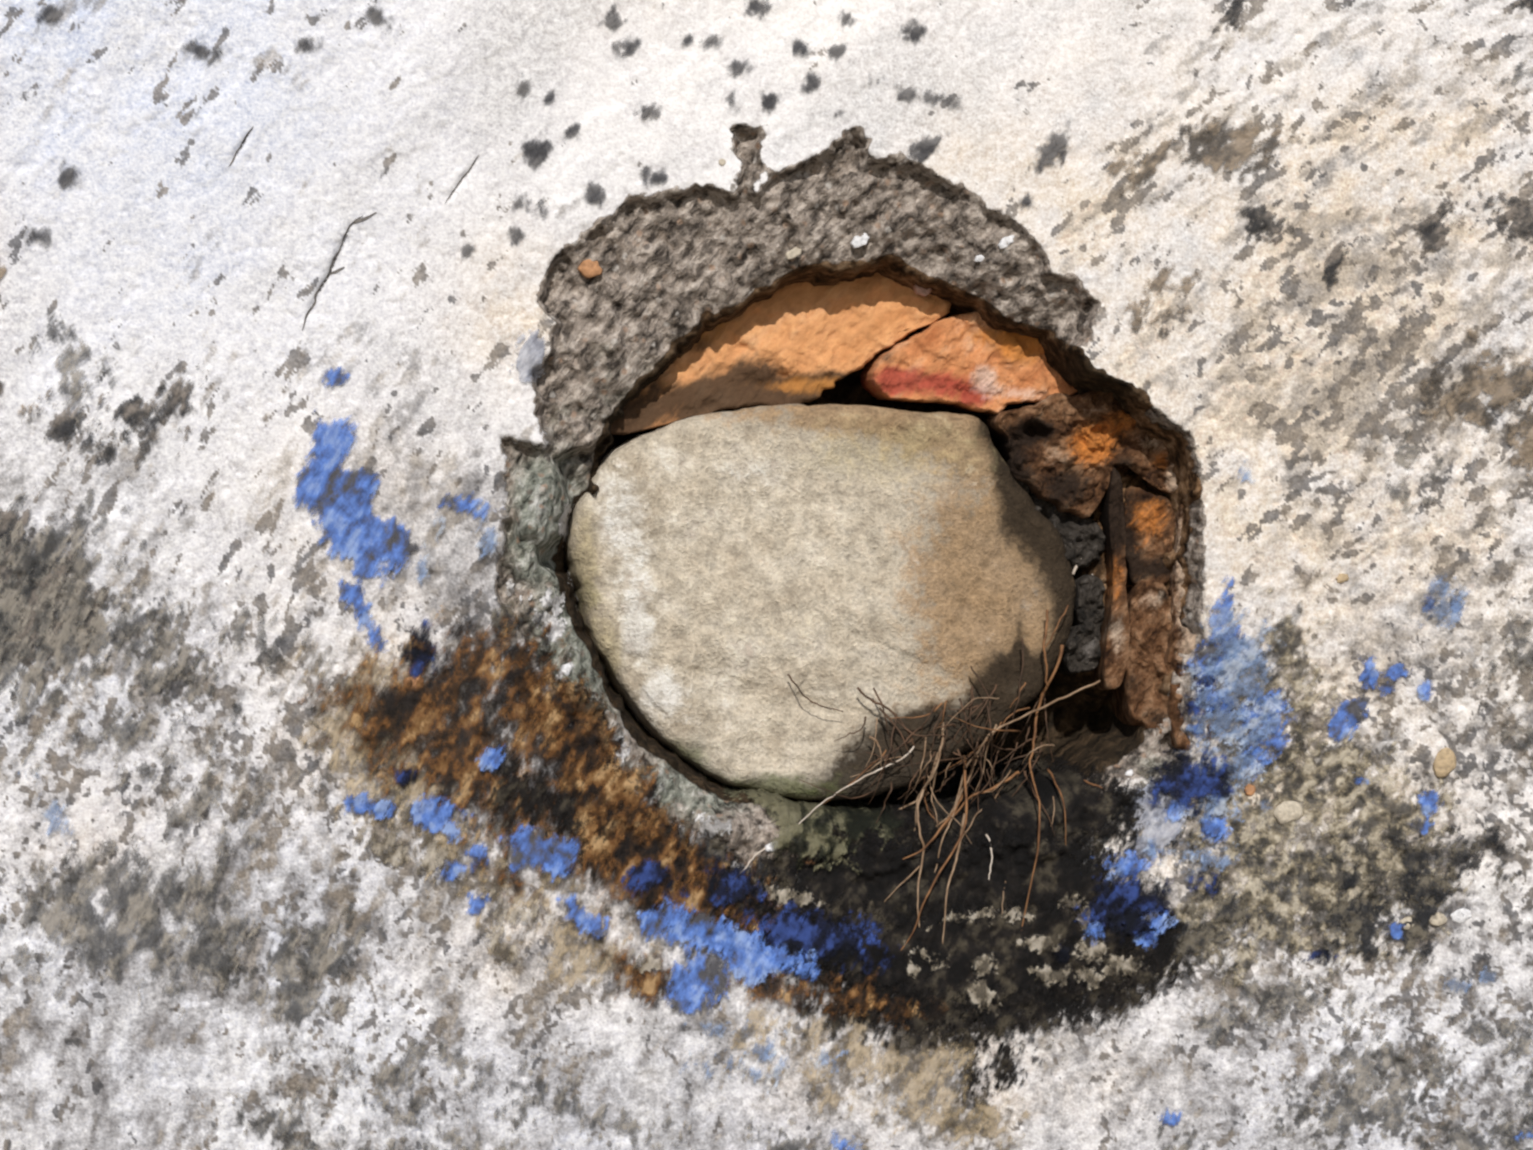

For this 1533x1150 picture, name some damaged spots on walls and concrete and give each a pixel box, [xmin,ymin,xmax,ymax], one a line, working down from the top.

peeling [322,367,350,386]
peeling [295,410,436,678]
spalling [434,123,1297,1036]
leakage [0,488,626,1063]
leakage [223,1025,692,1150]
peeling [344,768,611,966]
corrosion [299,615,782,1007]
corrosion [727,972,945,1023]
leakage [541,673,1533,1150]
peeling [1308,948,1339,963]
peeling [1408,790,1438,835]
leakage [1472,596,1533,772]